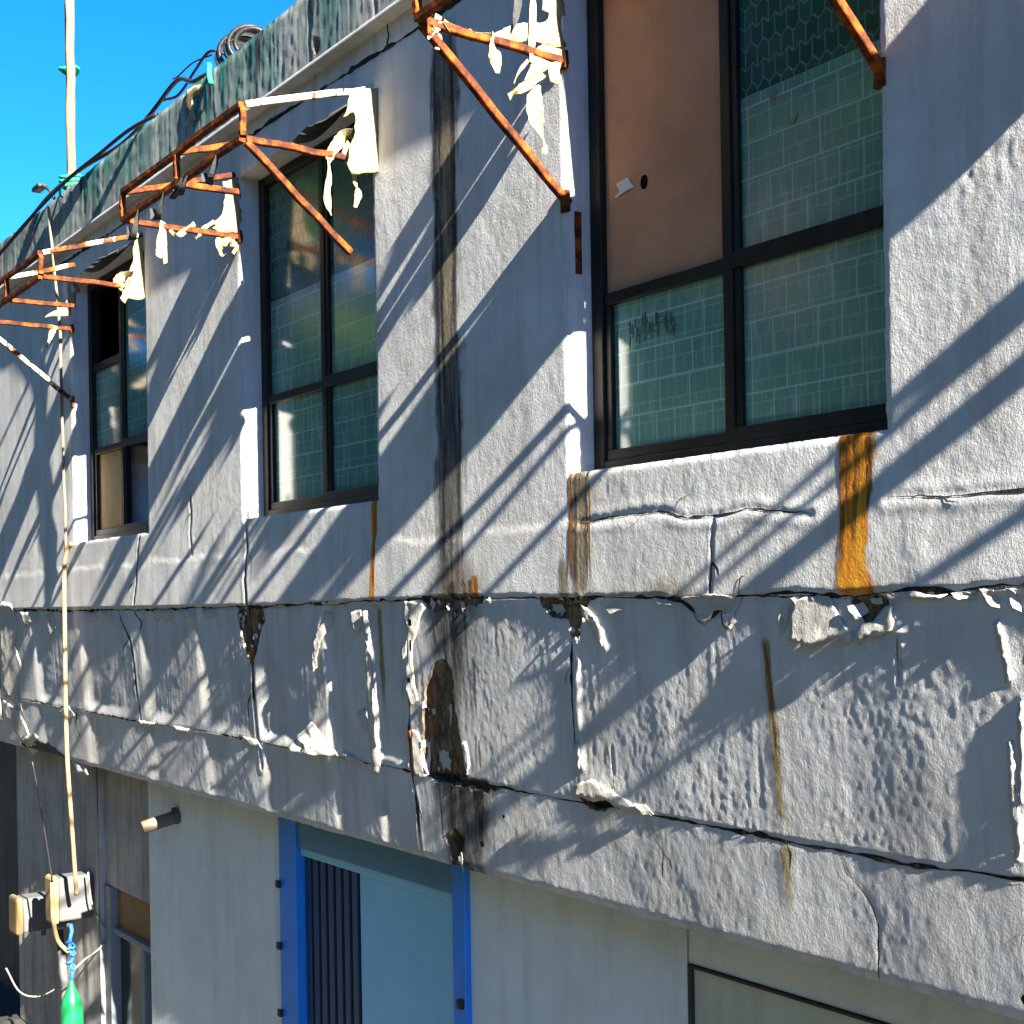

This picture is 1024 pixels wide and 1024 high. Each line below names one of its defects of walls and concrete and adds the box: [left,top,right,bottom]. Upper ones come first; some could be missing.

damp [429,34,479,729]
rust [569,471,591,595]
rust [837,431,876,598]
crack [891,488,1024,502]
peeling [288,608,382,775]
spalling [401,593,501,794]
damp [436,779,489,873]
crack [14,494,1024,765]
rust [762,641,784,818]
crack [647,814,1024,981]
peeling [778,588,1021,683]
peeling [1007,700,1024,864]